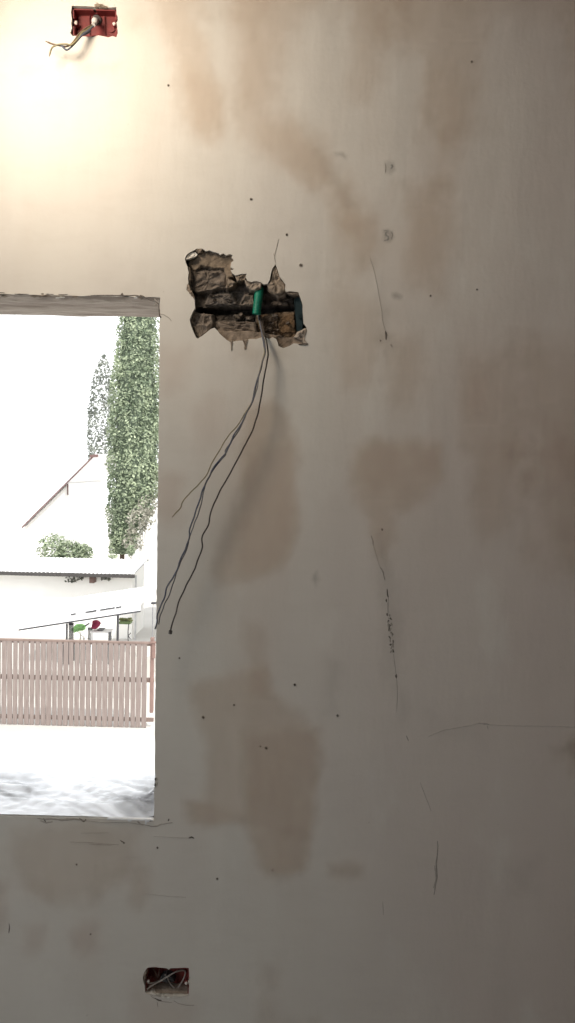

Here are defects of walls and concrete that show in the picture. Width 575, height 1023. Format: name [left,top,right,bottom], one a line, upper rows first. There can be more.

spalling [186,249,308,351]
crack [370,259,392,347]